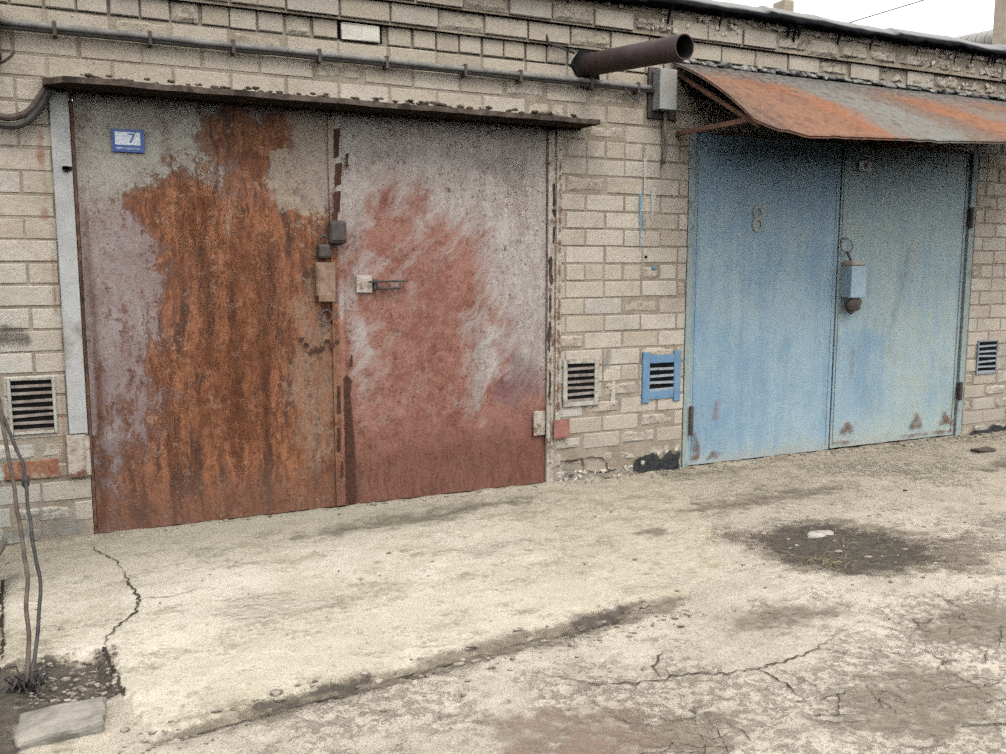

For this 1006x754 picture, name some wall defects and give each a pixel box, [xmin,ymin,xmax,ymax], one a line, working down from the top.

rust [904,396,956,437]
crack [90,543,201,647]
crack [127,592,1006,754]